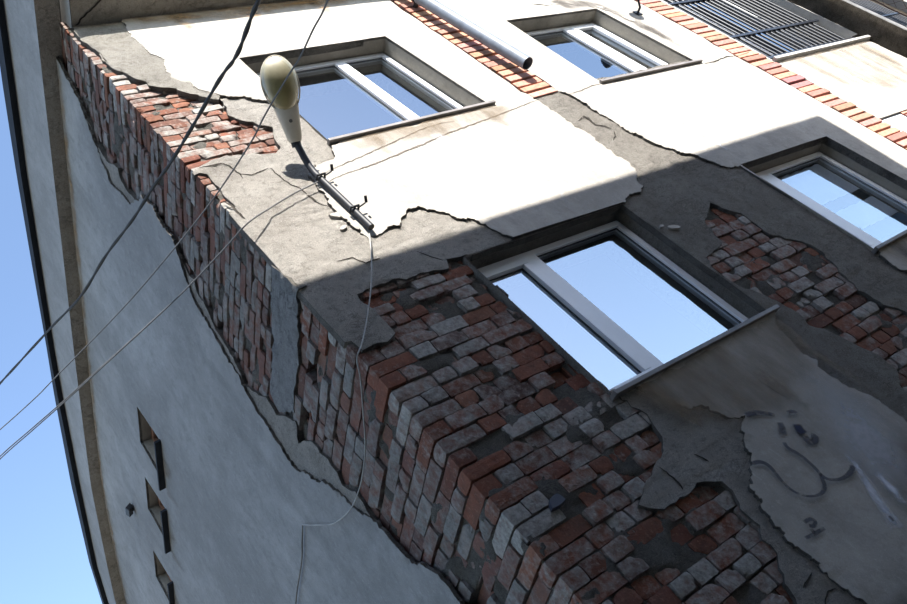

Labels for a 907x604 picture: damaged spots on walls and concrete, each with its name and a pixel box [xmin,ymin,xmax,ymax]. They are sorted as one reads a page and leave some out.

spalling [59,22,793,604]
spalling [535,91,907,422]
spalling [619,389,863,604]